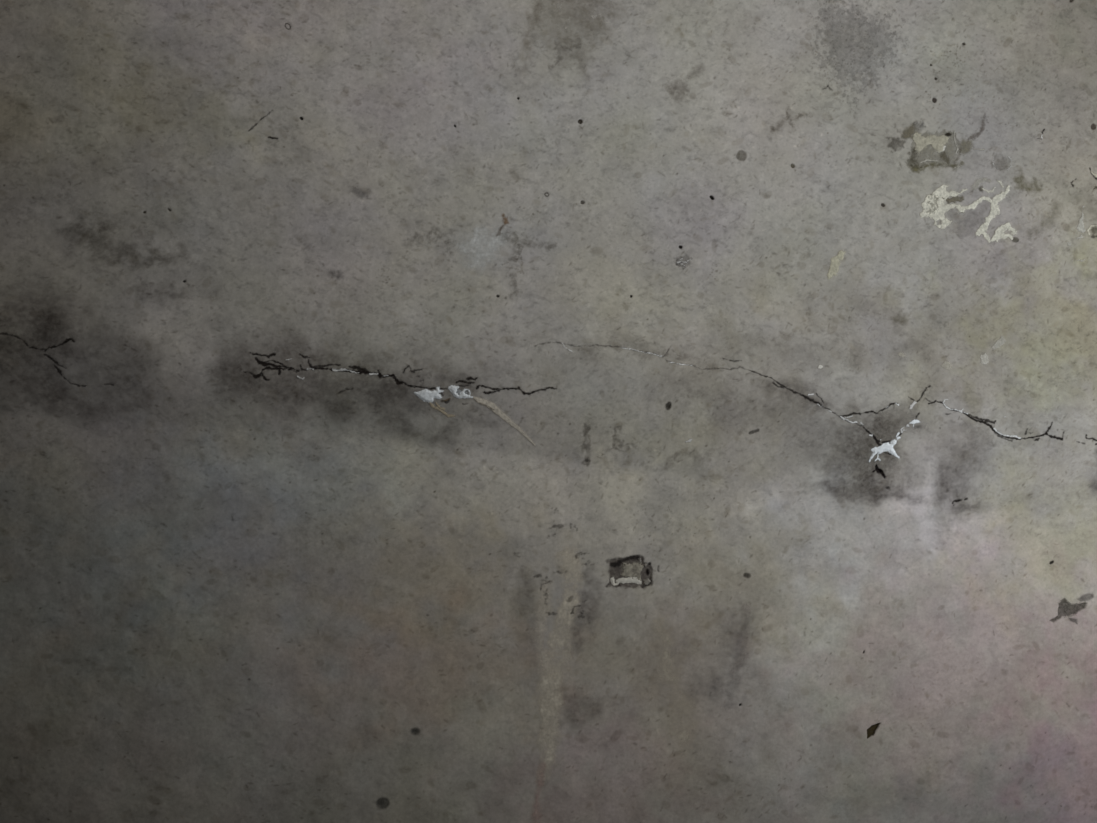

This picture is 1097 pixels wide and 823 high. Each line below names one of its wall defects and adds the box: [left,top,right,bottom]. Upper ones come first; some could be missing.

peeling [888,123,1019,242]
crack [1,333,113,387]
crack [250,352,557,403]
damp [414,385,535,445]
damp [869,401,920,462]
crack [723,358,1097,446]
spalling [607,556,652,588]
spalling [1051,600,1086,622]